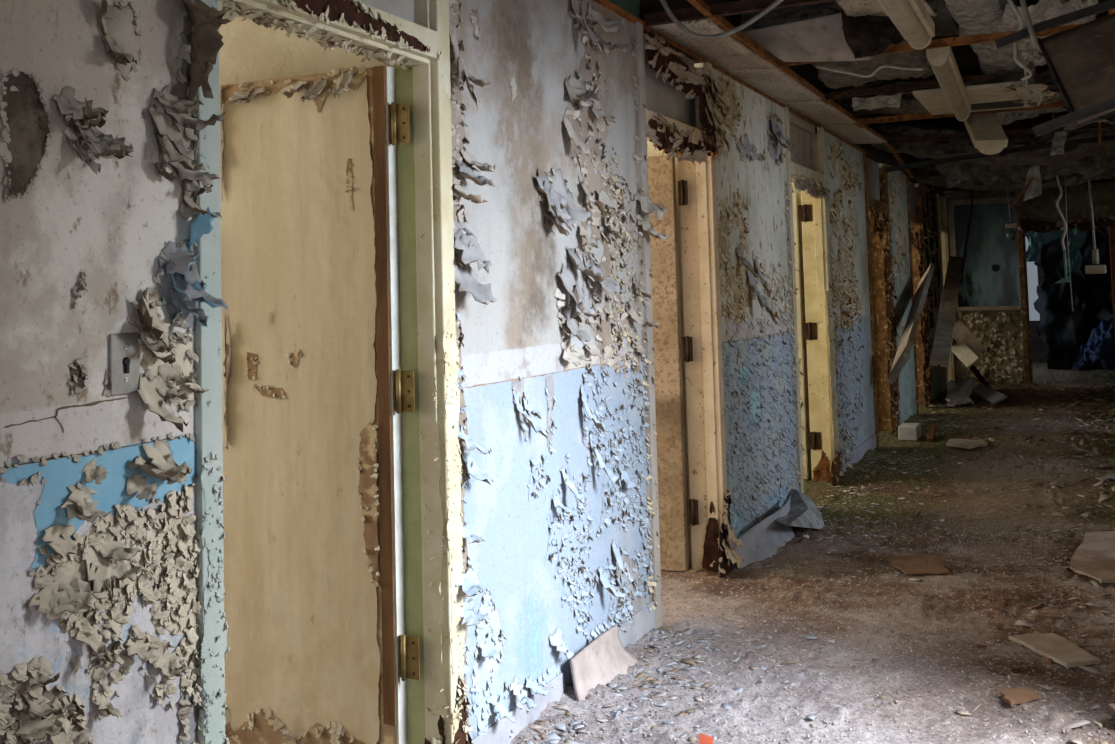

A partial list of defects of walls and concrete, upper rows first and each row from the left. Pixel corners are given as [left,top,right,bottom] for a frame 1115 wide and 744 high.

crack [3,397,186,468]
peeling [0,0,497,744]
peeling [419,0,799,744]
peeling [717,141,864,547]
corrosion [869,206,902,436]
peeling [957,311,1031,384]
corrosion [424,674,473,744]